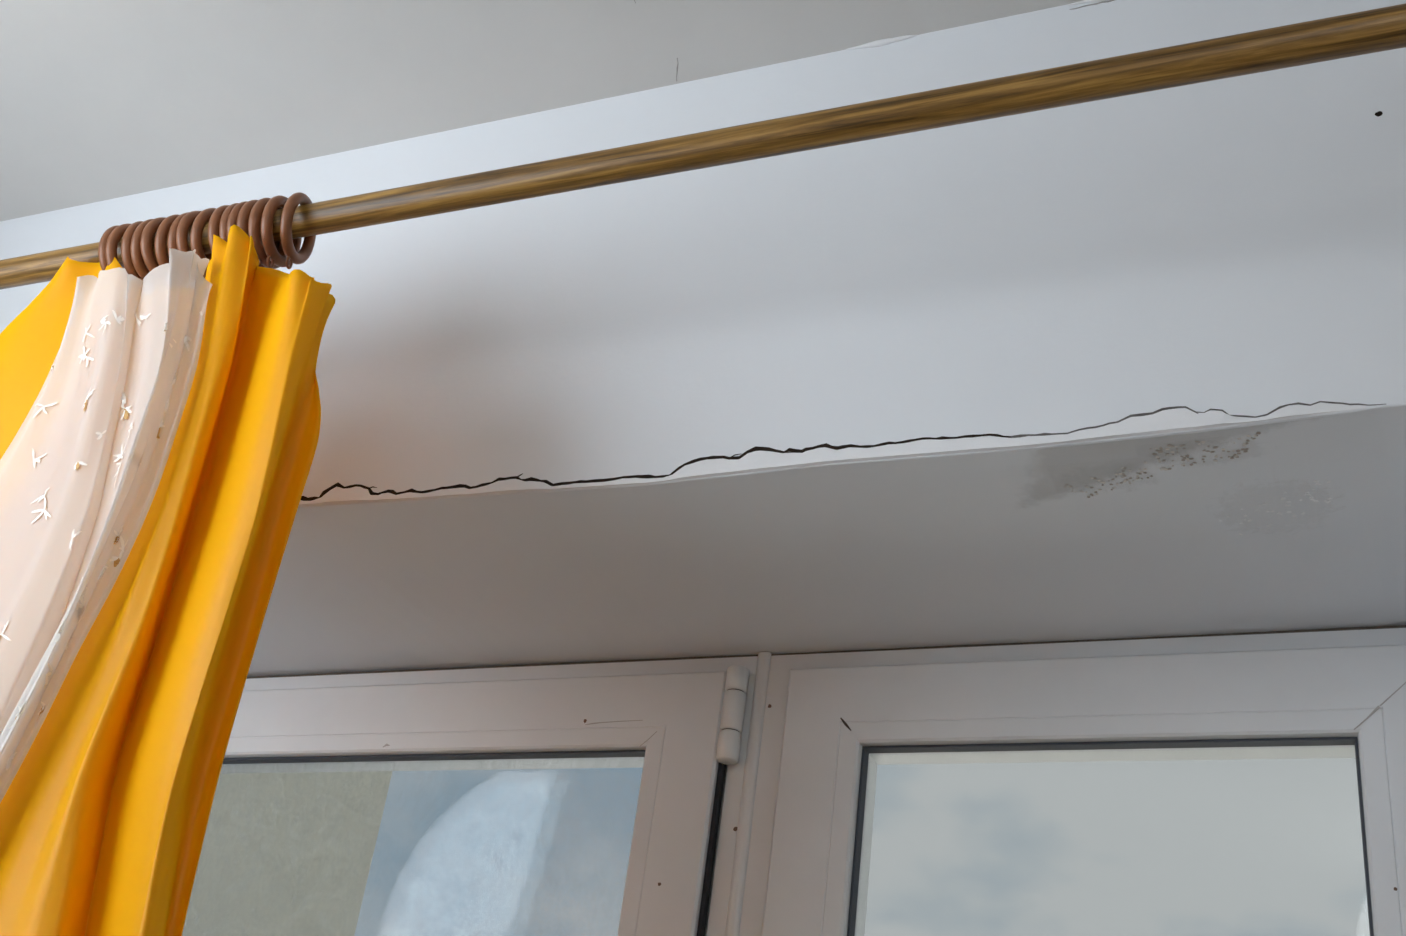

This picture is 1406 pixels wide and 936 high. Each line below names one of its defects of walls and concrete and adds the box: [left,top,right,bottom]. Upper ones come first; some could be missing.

crack [301,401,1385,501]